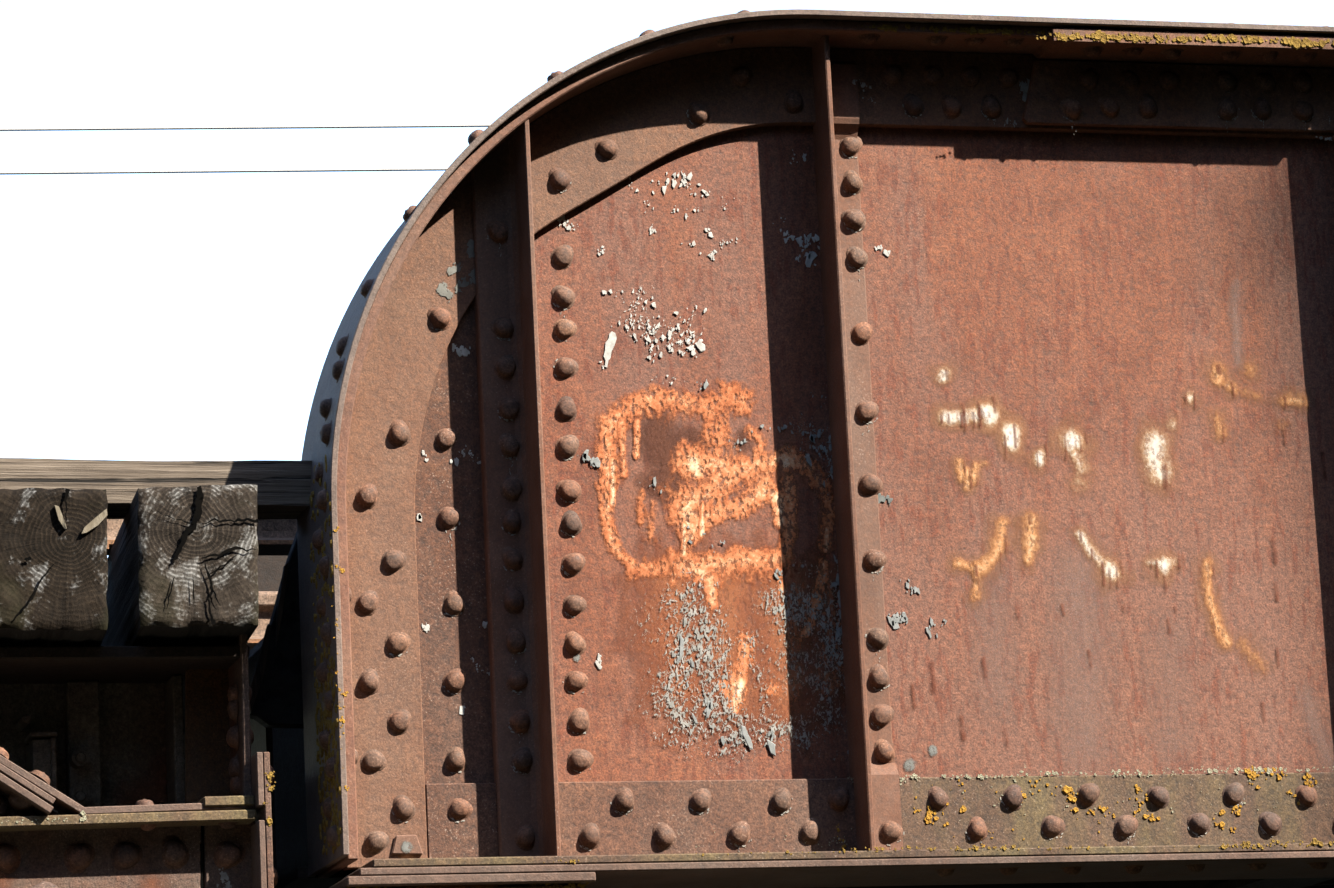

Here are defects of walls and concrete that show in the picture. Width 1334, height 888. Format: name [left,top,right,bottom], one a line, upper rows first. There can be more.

peeling [629,171,735,235]
peeling [681,228,738,261]
peeling [773,217,820,268]
peeling [599,287,707,369]
peeling [582,450,600,468]
corrosion [938,397,1088,471]
corrosion [1140,422,1175,487]
corrosion [595,379,845,734]
corrosion [954,518,1007,599]
corrosion [1077,531,1122,585]
peeling [626,526,849,775]
corrosion [122,763,167,806]